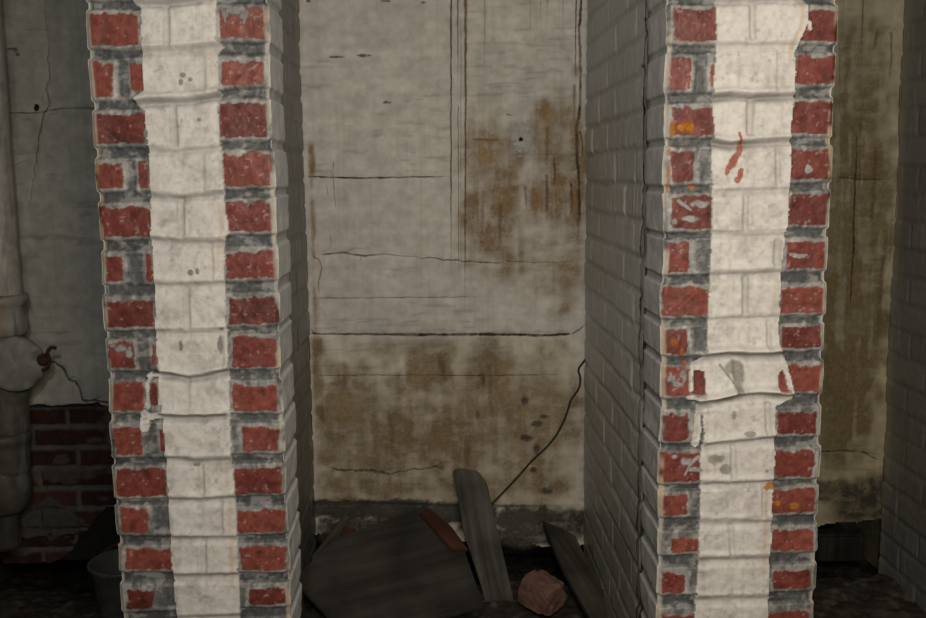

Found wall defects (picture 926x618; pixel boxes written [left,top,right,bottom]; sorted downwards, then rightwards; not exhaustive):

peeling [220,6,248,24]
corrosion [450,0,467,223]
leakage [461,130,524,274]
leakage [530,100,587,252]
crack [575,0,583,211]
peeling [672,199,708,224]
peeling [725,132,743,183]
flaking render [2,406,120,564]
crack [51,361,109,403]
leakage [312,339,584,548]
peeling [672,455,731,476]
peeling [719,360,744,395]